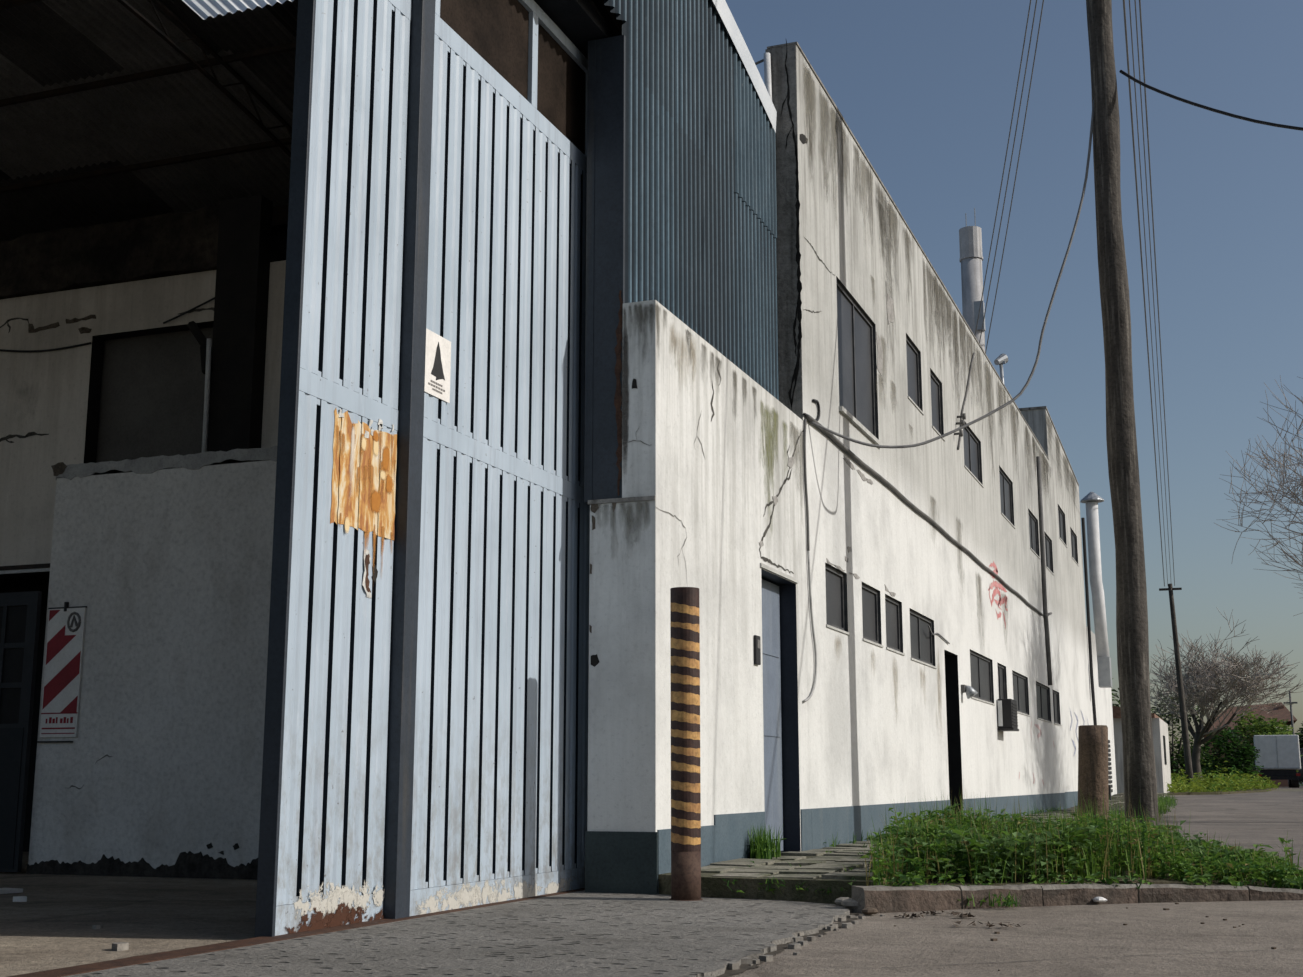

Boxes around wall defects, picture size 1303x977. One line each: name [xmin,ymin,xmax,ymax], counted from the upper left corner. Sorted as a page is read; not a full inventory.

crack [0,432,49,443]
spalling [28,315,96,334]
leakage [621,304,666,459]
leakage [686,330,803,475]
crack [759,41,834,574]
leakage [805,69,1076,499]
spalling [26,843,258,880]
rust [286,903,384,934]